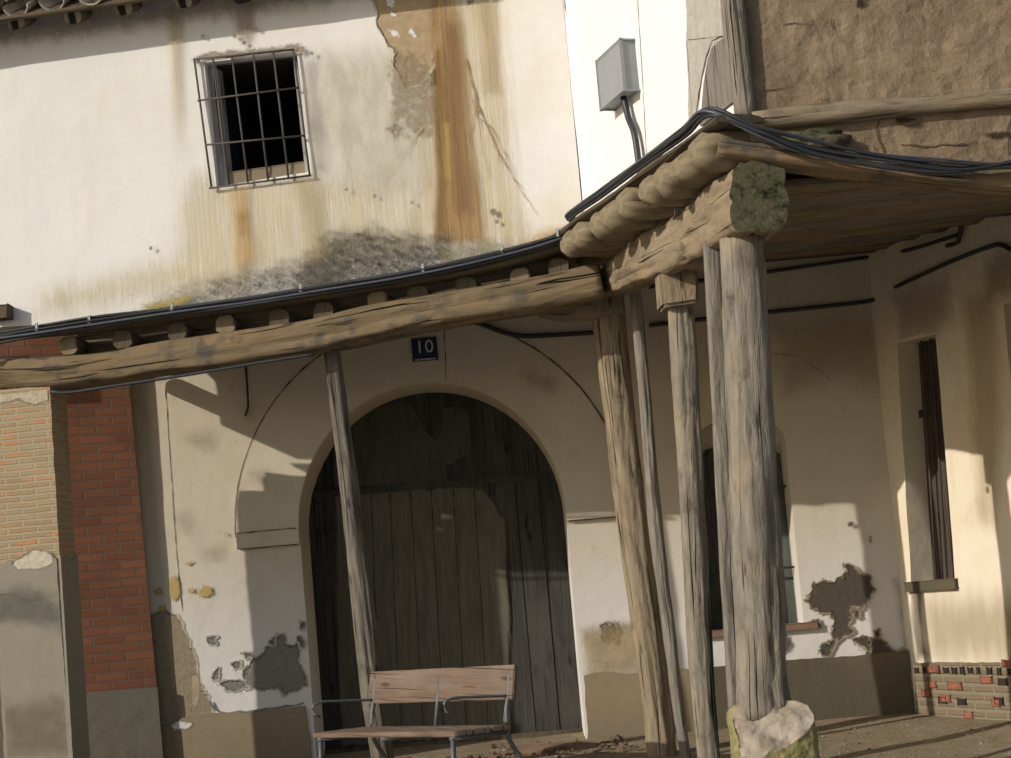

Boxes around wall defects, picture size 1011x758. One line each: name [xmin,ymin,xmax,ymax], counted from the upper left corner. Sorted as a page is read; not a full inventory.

water stain [54,0,524,308]
flaking render [371,0,439,136]
crack [465,59,536,213]
spalling [12,549,53,570]
flaking render [150,576,309,731]
peeling [804,562,907,658]